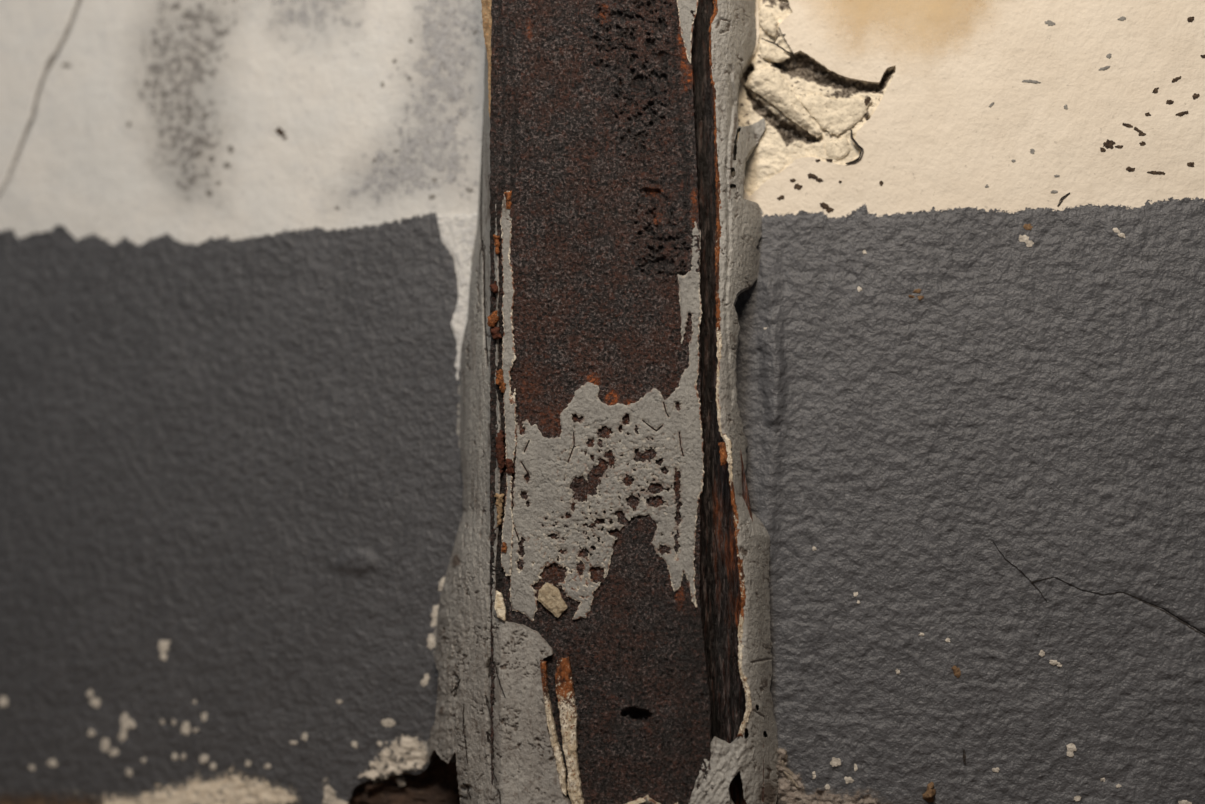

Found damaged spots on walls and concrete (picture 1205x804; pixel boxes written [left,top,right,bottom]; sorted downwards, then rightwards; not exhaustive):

crack [0,0,81,195]
damp [136,0,248,207]
damp [335,0,483,210]
flaking render [738,0,895,200]
peeling [437,212,478,380]
corrosion [487,310,503,340]
corrosion [495,430,515,474]
corrosion [718,442,728,466]
crack [994,543,1205,636]
damp [0,768,296,804]
flaking render [349,755,460,804]
peeling [540,656,584,804]